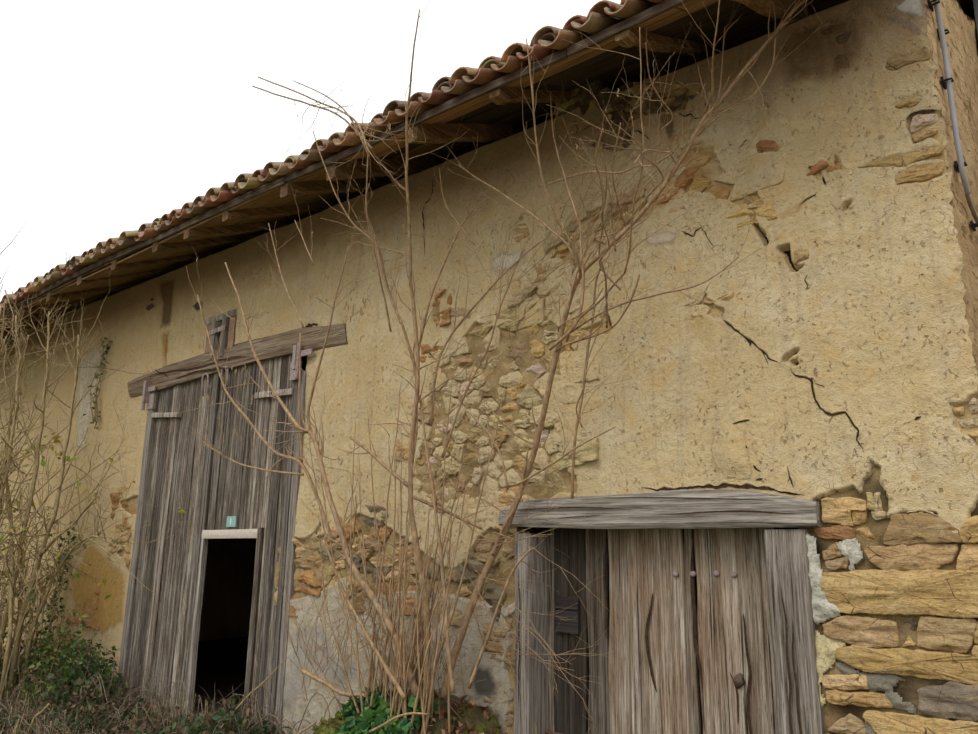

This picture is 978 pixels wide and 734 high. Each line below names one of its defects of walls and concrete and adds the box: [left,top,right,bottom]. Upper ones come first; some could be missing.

spalling [807,154,842,180]
spalling [858,95,947,185]
spalling [289,125,785,734]
crack [721,314,864,452]
spalling [273,546,281,606]
spalling [798,466,978,734]